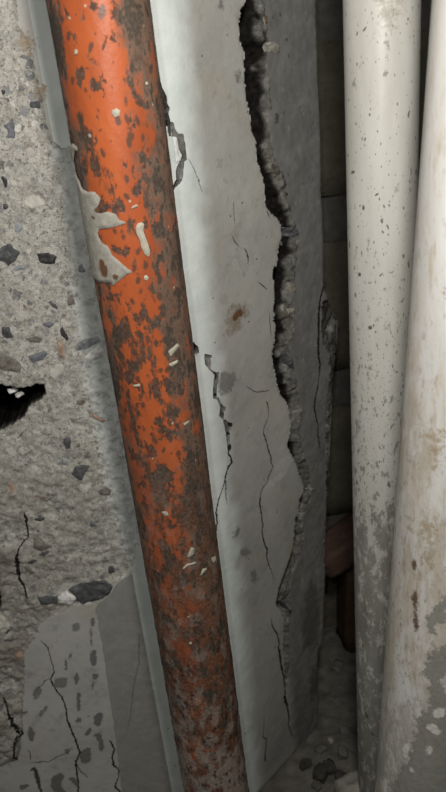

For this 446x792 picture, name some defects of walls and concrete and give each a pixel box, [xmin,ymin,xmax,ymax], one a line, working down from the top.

crack [161,85,201,190]
corrosion [99,259,118,280]
spalling [0,0,141,765]
crack [238,0,324,736]
crack [14,513,29,598]
crack [3,641,87,792]
flaking render [51,773,79,792]
crack [109,740,120,792]